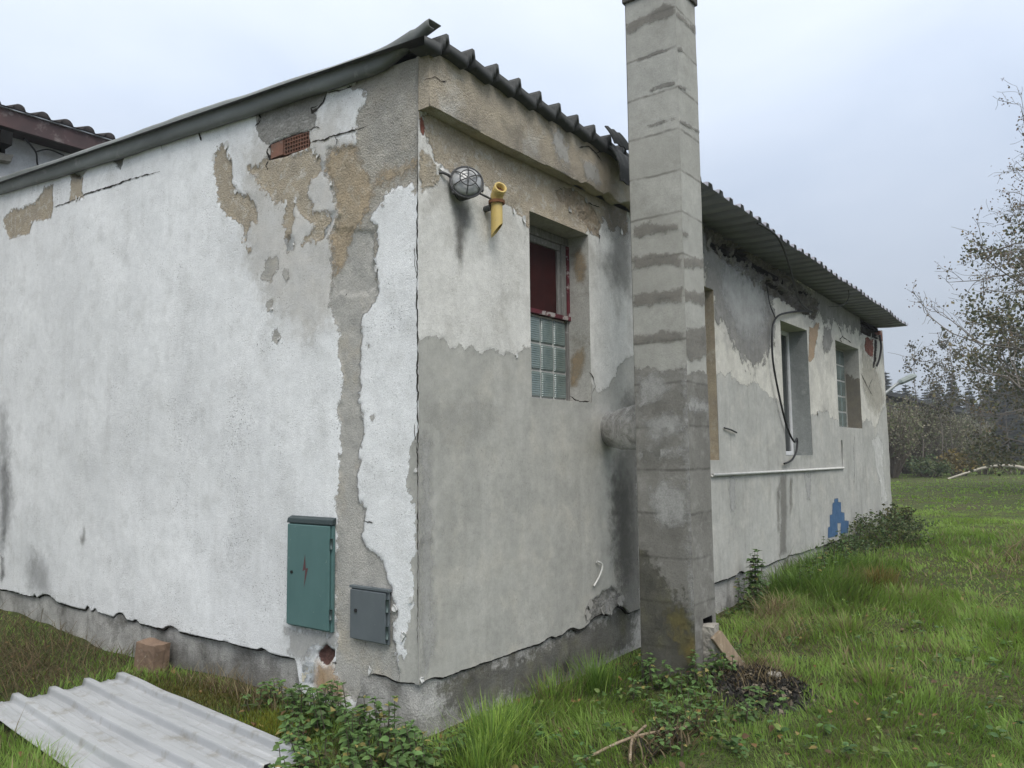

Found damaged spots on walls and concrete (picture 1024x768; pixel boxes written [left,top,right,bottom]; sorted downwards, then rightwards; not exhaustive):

crack [310,86,366,144]
peeling [3,184,53,239]
crack [55,146,162,207]
spalling [704,226,820,362]
peeling [213,56,640,702]
spalling [860,326,883,368]
leakage [437,222,776,716]
crack [0,589,295,660]
crack [373,605,640,684]